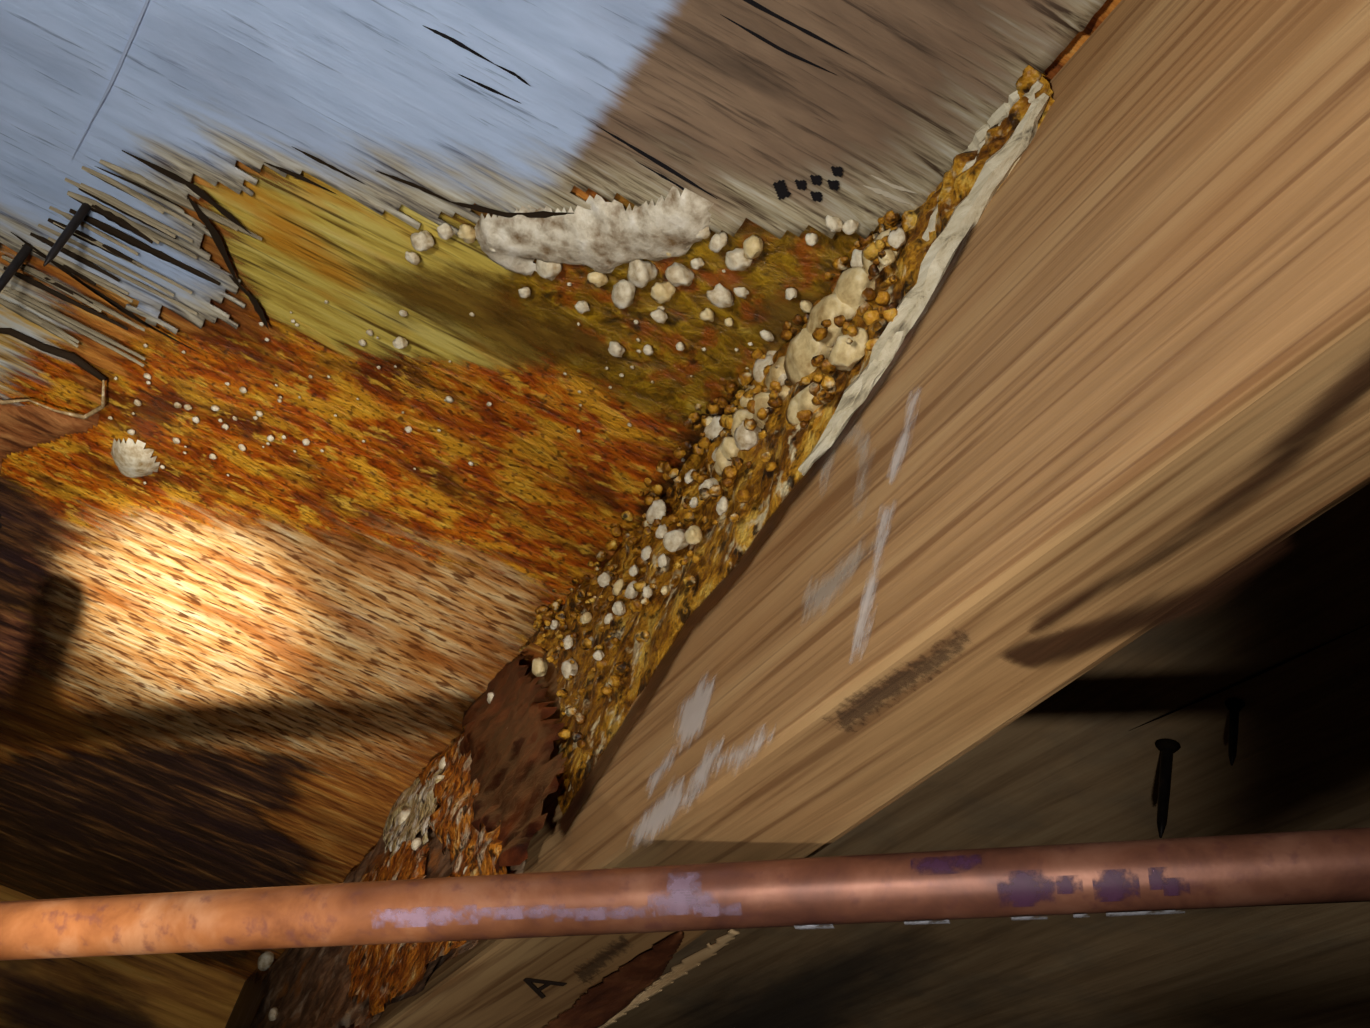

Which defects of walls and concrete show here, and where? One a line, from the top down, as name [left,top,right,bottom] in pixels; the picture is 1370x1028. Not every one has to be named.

peeling [0,328,107,473]
leakage [0,223,878,899]